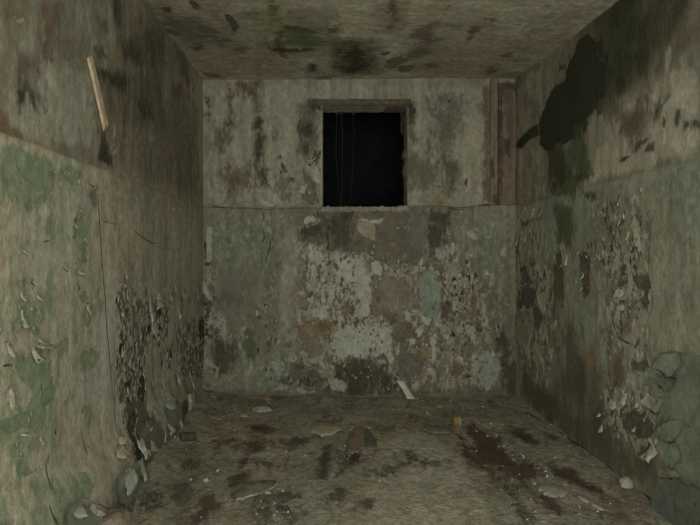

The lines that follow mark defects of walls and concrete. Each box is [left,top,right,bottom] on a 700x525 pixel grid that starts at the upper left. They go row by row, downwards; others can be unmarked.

leakage [220,92,267,198]
leakage [297,100,321,156]
leakage [516,0,654,248]
leakage [674,109,700,128]
peeling [73,210,94,284]
spalling [243,147,502,395]
leakage [554,253,564,302]
peeling [558,196,652,375]
peeling [0,278,69,479]
spalling [115,269,222,476]
spalling [596,387,657,464]